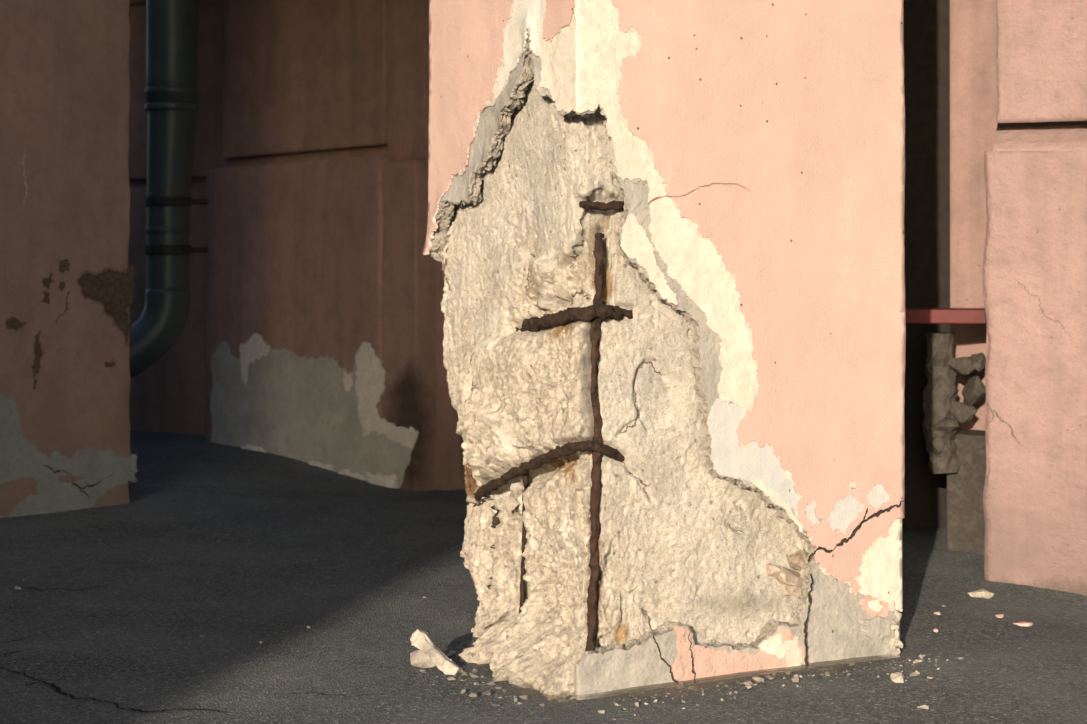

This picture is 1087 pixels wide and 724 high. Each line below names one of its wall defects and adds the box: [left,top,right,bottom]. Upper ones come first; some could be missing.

rust [588,216,612,303]
peeling [0,393,138,518]
crack [43,465,113,499]
peeling [210,333,419,489]
rust [549,459,577,478]
spalling [440,0,889,700]
crack [803,500,905,666]
peeling [849,518,903,657]